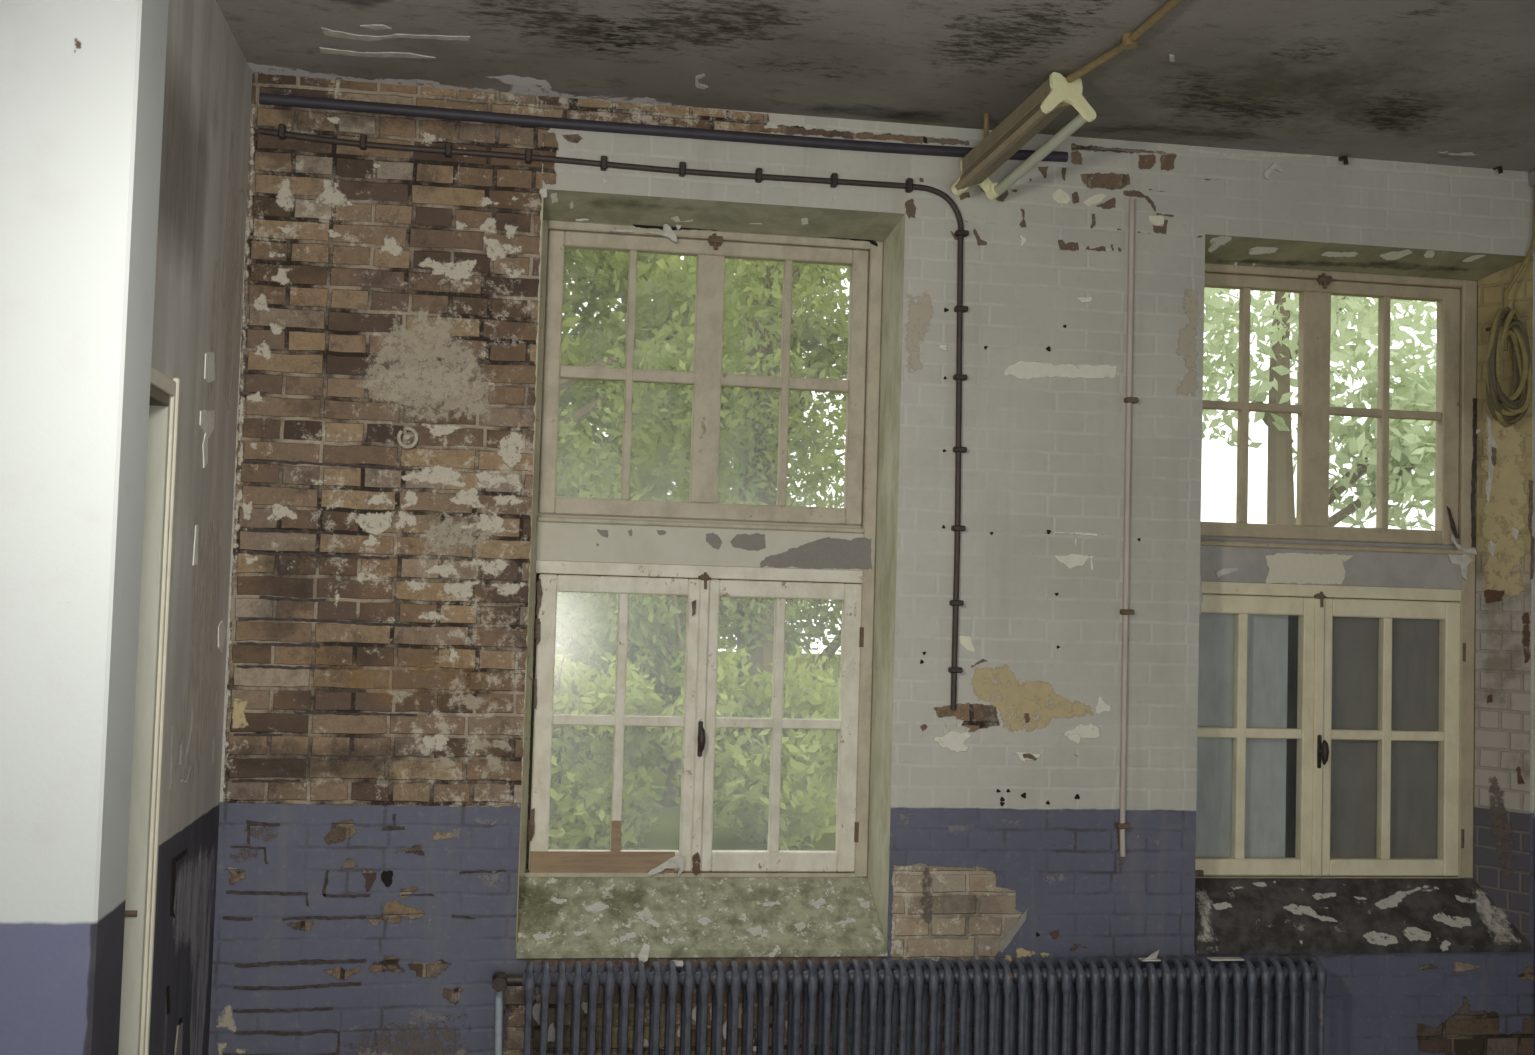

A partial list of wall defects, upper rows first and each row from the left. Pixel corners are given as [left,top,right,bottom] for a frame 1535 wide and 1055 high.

water stain [465,0,805,54]
water stain [938,0,1100,71]
peeling [199,410,214,468]
peeling [211,62,969,892]
flaking render [920,636,1111,756]
peeling [166,826,277,1055]
spalling [324,955,463,1025]
spalling [502,863,1049,1055]
peeling [1200,881,1276,941]
peeling [1283,892,1338,922]
peeling [1355,885,1515,972]
spalling [1417,997,1534,1055]